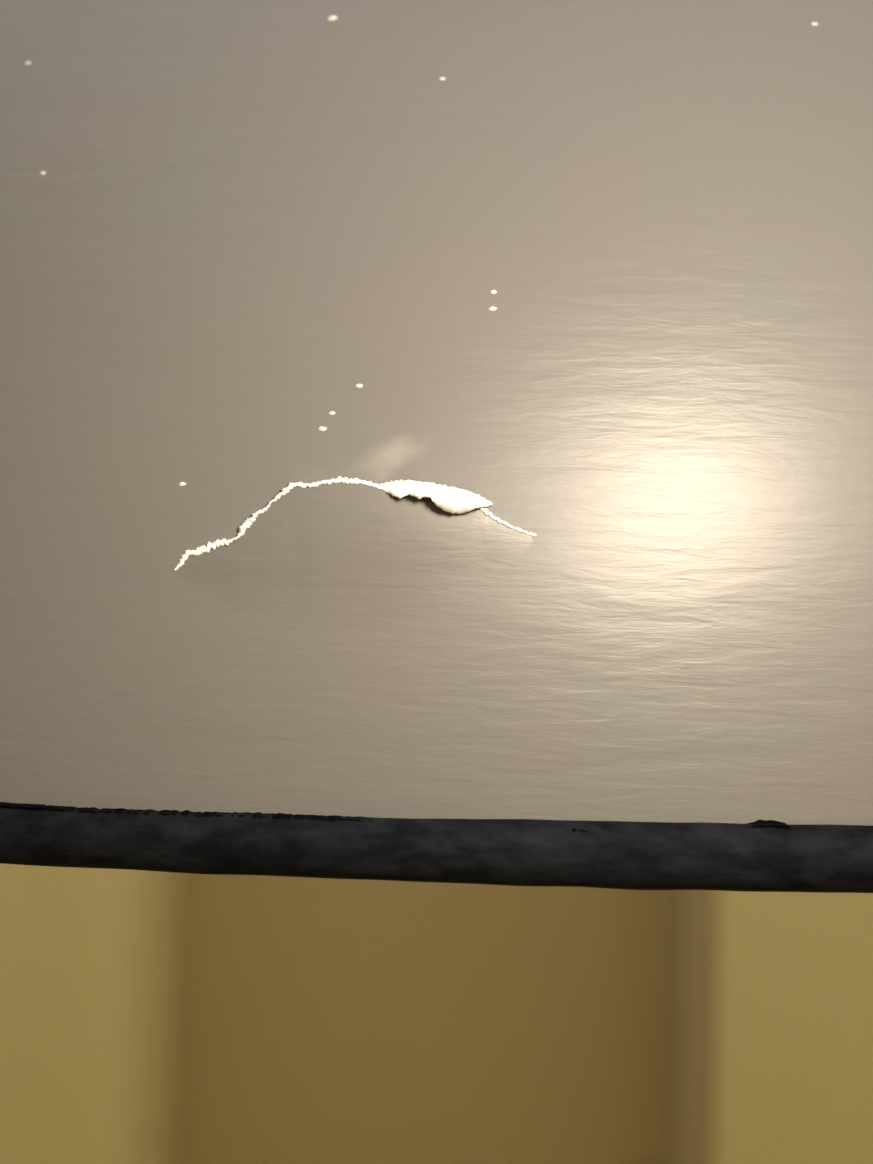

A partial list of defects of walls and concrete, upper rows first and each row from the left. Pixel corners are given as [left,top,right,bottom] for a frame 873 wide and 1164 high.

crack [174,476,537,571]